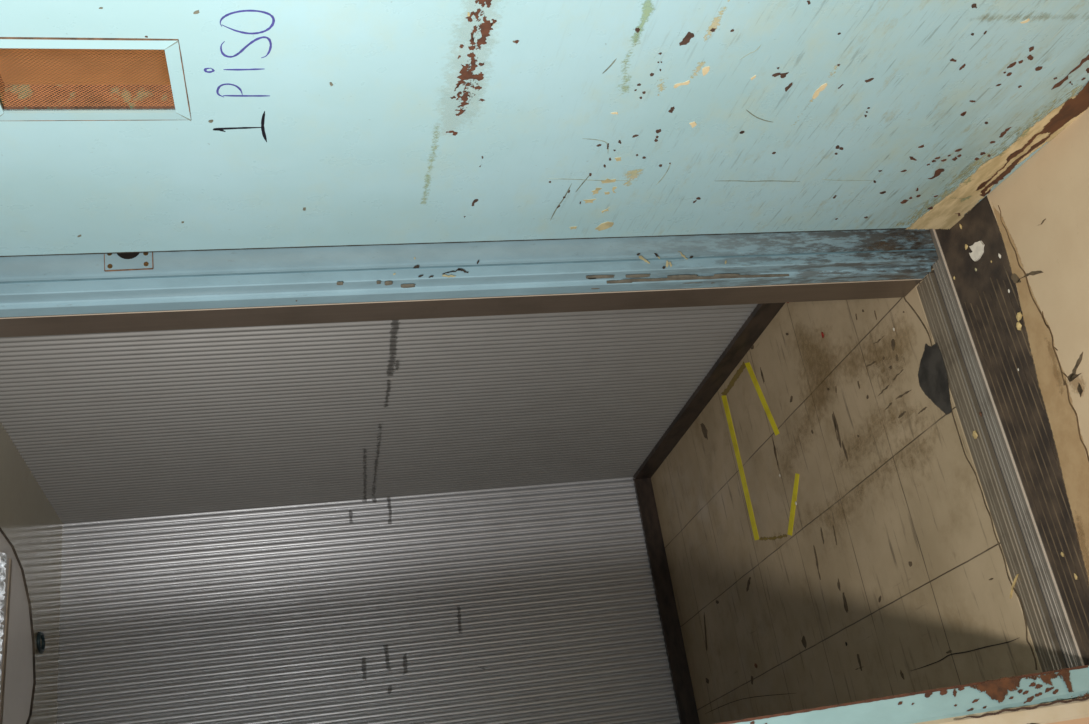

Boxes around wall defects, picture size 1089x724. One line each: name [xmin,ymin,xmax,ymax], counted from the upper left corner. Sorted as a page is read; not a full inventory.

leakage [632,0,653,42]
spalling [679,7,734,46]
rust [450,0,497,116]
spalling [996,46,1042,86]
peeling [897,55,1089,230]
peeling [580,135,638,231]
spalling [376,257,479,288]
spalling [586,251,789,289]
peeling [857,297,1058,704]
spalling [925,687,986,711]